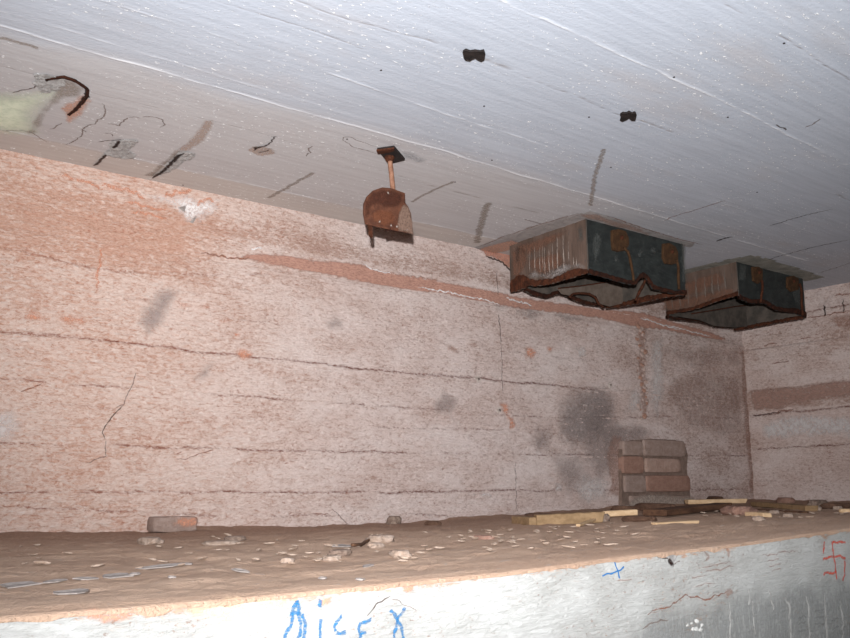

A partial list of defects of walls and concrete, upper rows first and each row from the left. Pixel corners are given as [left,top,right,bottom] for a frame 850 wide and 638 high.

spalling [13,74,89,120]
water stain [0,98,35,130]
crack [6,104,165,145]
spalling [93,133,138,166]
spalling [153,151,196,178]
spalling [249,136,276,156]
crack [87,374,136,463]